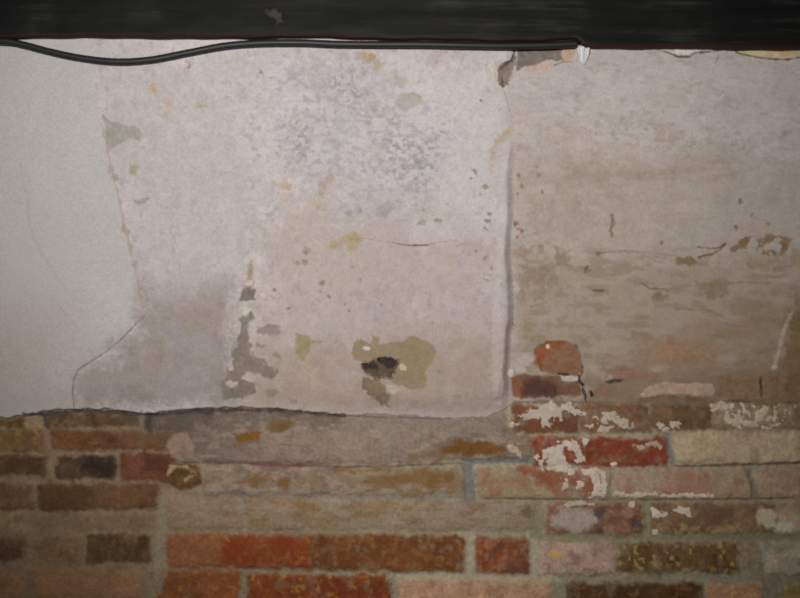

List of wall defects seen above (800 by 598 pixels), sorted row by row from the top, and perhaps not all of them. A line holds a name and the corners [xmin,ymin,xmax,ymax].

spalling [492,48,577,88]
flaking render [657,49,720,64]
flaking render [734,51,800,61]
crack [360,236,458,247]
damp [507,113,796,345]
spalling [600,232,800,273]
crack [21,315,452,435]
flaking render [219,259,298,405]
spalling [351,334,438,408]
crack [557,365,595,403]
damp [767,285,800,407]
flaking render [506,339,797,519]